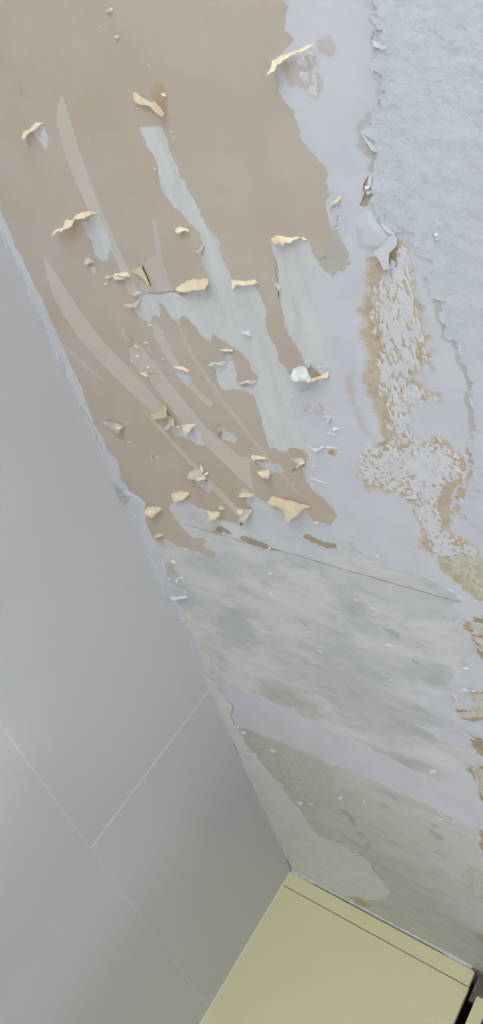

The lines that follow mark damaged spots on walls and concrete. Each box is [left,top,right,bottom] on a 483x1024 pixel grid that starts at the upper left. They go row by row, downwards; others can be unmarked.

peeling [0,0,401,570]
damp [201,550,467,777]
damp [339,230,483,605]
peeling [358,0,483,528]